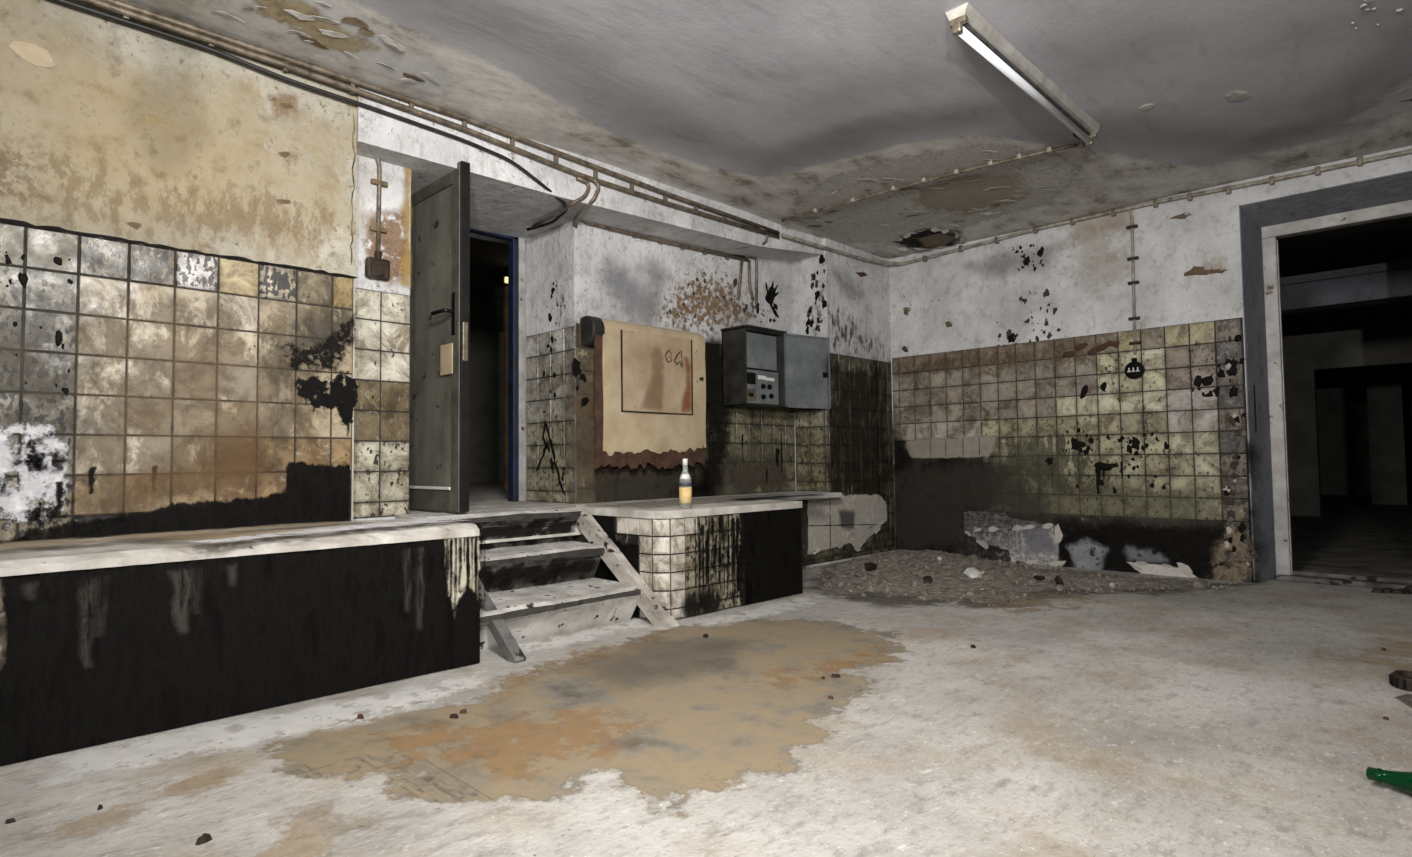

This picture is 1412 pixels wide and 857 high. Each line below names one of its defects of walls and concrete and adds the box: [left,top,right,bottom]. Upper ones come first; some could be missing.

leakage [0,0,344,238]
leakage [828,308,879,446]
leakage [42,572,62,600]
spalling [963,511,1066,566]